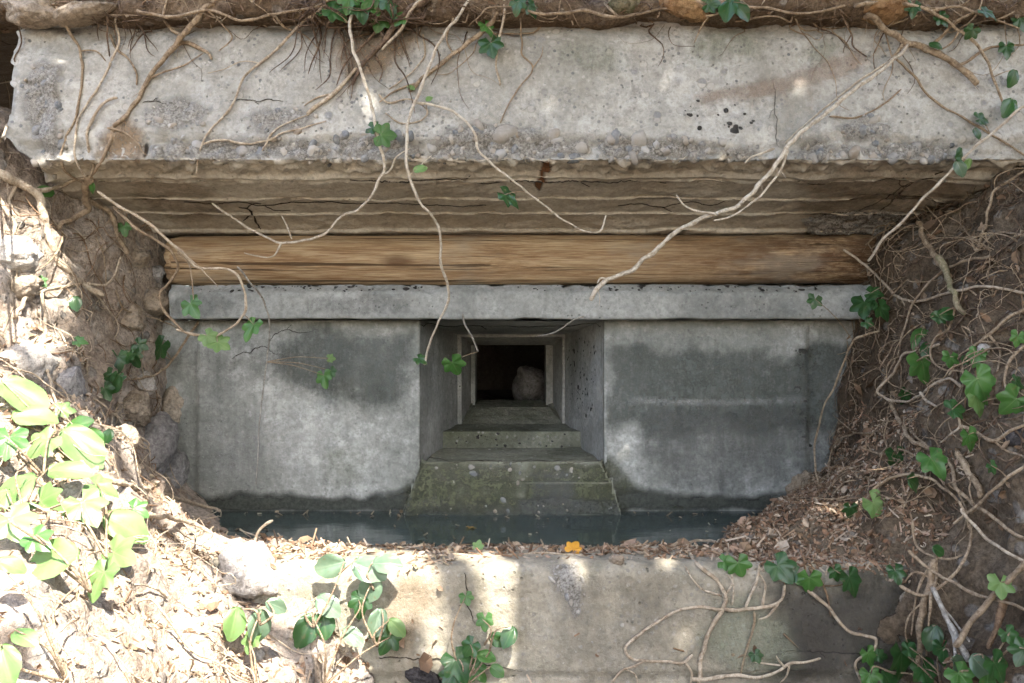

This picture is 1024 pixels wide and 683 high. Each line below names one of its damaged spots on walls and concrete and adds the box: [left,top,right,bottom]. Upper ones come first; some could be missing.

crack [189,176,735,229]
rust [534,161,551,191]
damp [278,326,408,403]
damp [197,343,849,515]